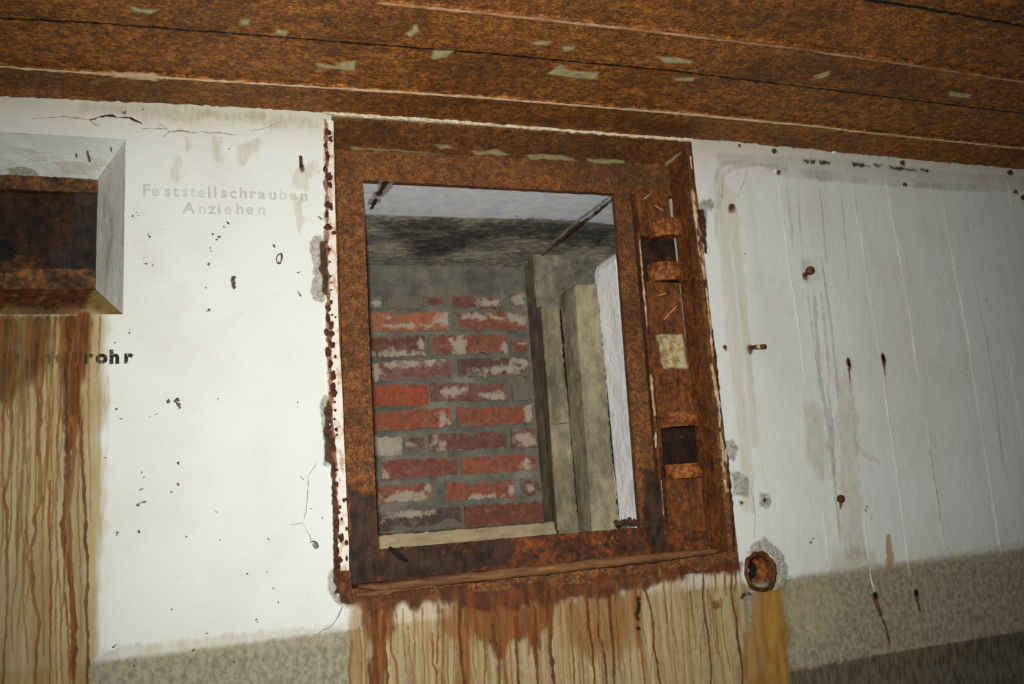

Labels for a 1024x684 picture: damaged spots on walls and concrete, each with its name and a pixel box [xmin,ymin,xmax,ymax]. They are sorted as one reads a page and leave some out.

rust [0,289,105,684]
crack [34,114,276,136]
rust [368,180,394,209]
rust [347,439,789,684]
rust [542,196,612,256]
peeling [691,190,748,496]
rust [712,329,727,414]
rust [873,596,890,644]
leakage [855,208,910,571]
leakage [853,163,928,382]